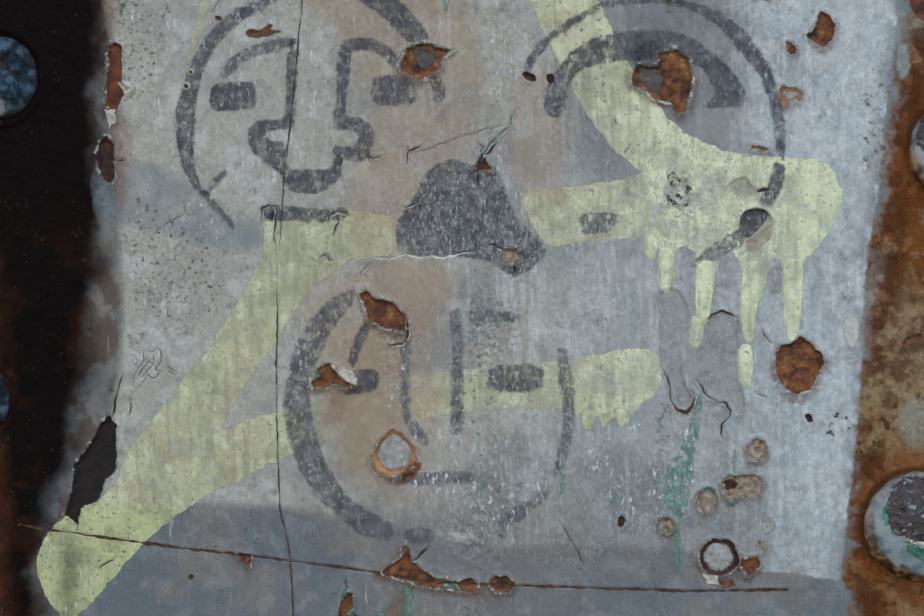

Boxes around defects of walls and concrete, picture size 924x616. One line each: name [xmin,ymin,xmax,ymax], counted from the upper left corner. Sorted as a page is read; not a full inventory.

peeling [786,12,838,54]
peeling [94,40,136,186]
crack [261,0,303,246]
crack [339,151,382,168]
crack [406,111,519,166]
peeling [628,45,696,115]
rust [915,116,924,151]
crack [317,211,346,263]
peeling [774,335,826,394]
peeling [62,376,122,526]
crack [18,289,788,616]
rust [886,476,924,542]